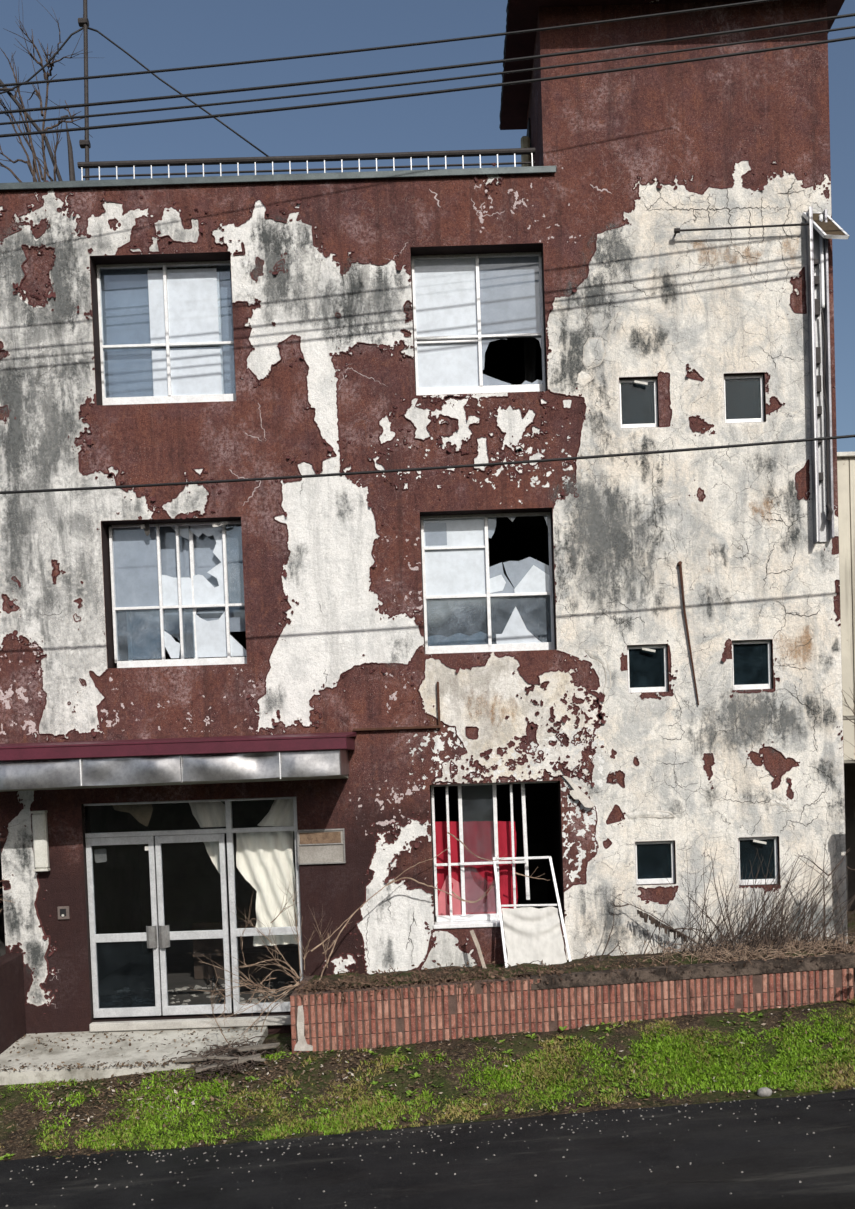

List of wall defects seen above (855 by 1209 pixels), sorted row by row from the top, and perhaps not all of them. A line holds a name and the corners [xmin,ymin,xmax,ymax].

damp [0,218,89,328]
crack [644,181,803,284]
damp [0,343,84,587]
damp [28,509,107,732]
peeling [0,147,848,976]
damp [554,436,668,626]
crack [659,512,835,854]
peeling [0,790,58,1014]